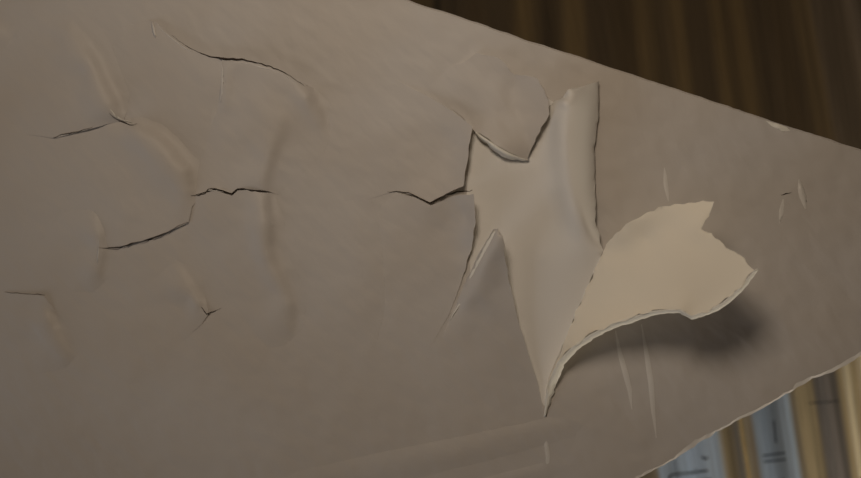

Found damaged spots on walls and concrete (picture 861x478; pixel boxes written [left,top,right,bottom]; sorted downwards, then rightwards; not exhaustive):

crack [151,22,302,99]
crack [191,188,258,196]
crack [392,190,472,203]
crack [97,222,189,263]
peeling [328,53,758,426]